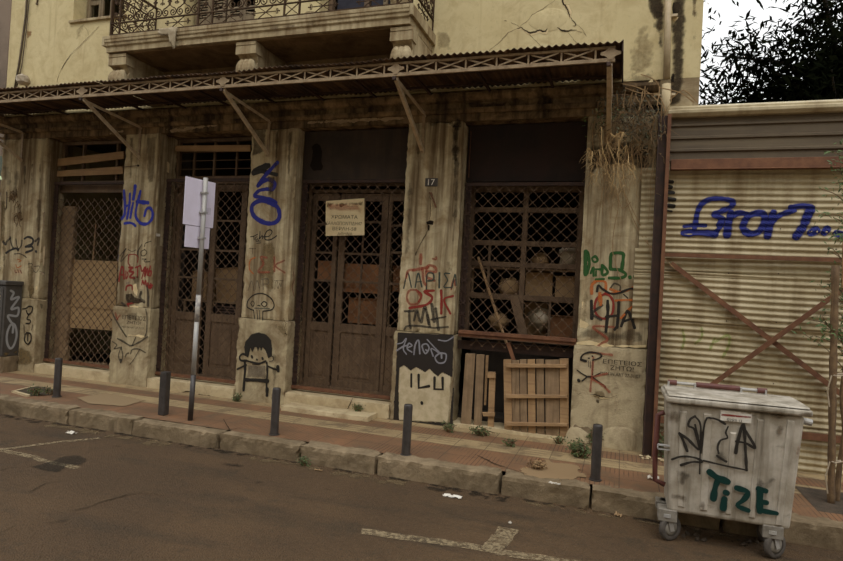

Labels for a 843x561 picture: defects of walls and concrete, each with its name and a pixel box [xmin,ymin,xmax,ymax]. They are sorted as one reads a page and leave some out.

crack [491,0,586,49]
damp [649,0,696,104]